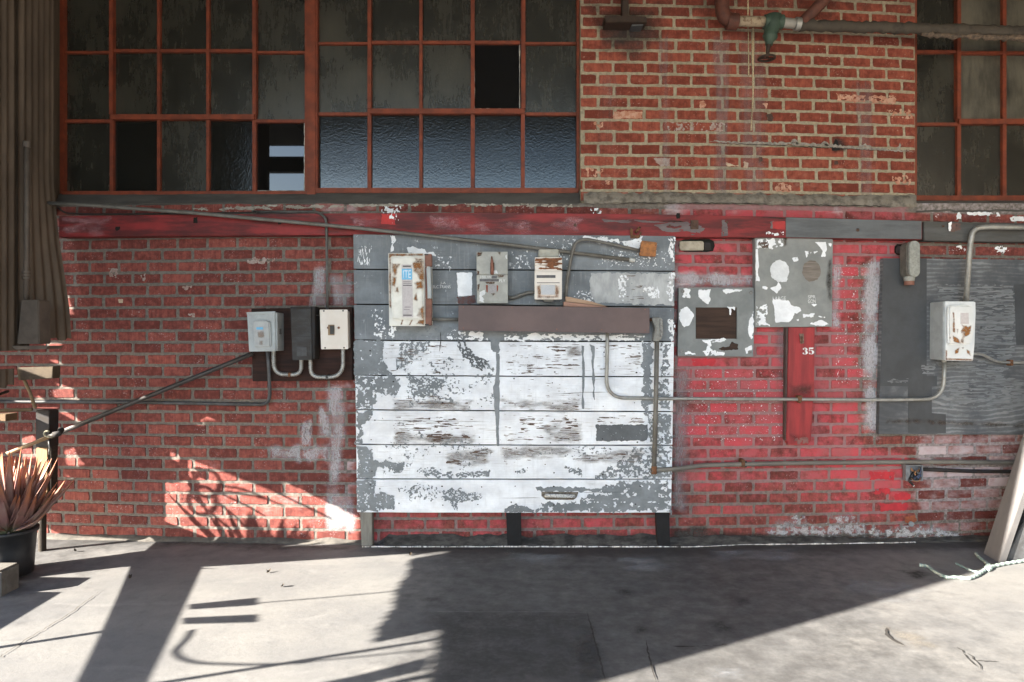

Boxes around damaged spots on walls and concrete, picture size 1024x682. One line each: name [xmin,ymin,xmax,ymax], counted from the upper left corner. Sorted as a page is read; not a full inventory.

peeling [938,212,1024,232]
peeling [193,168,916,516]
water stain [274,390,340,475]
water stain [745,515,959,539]